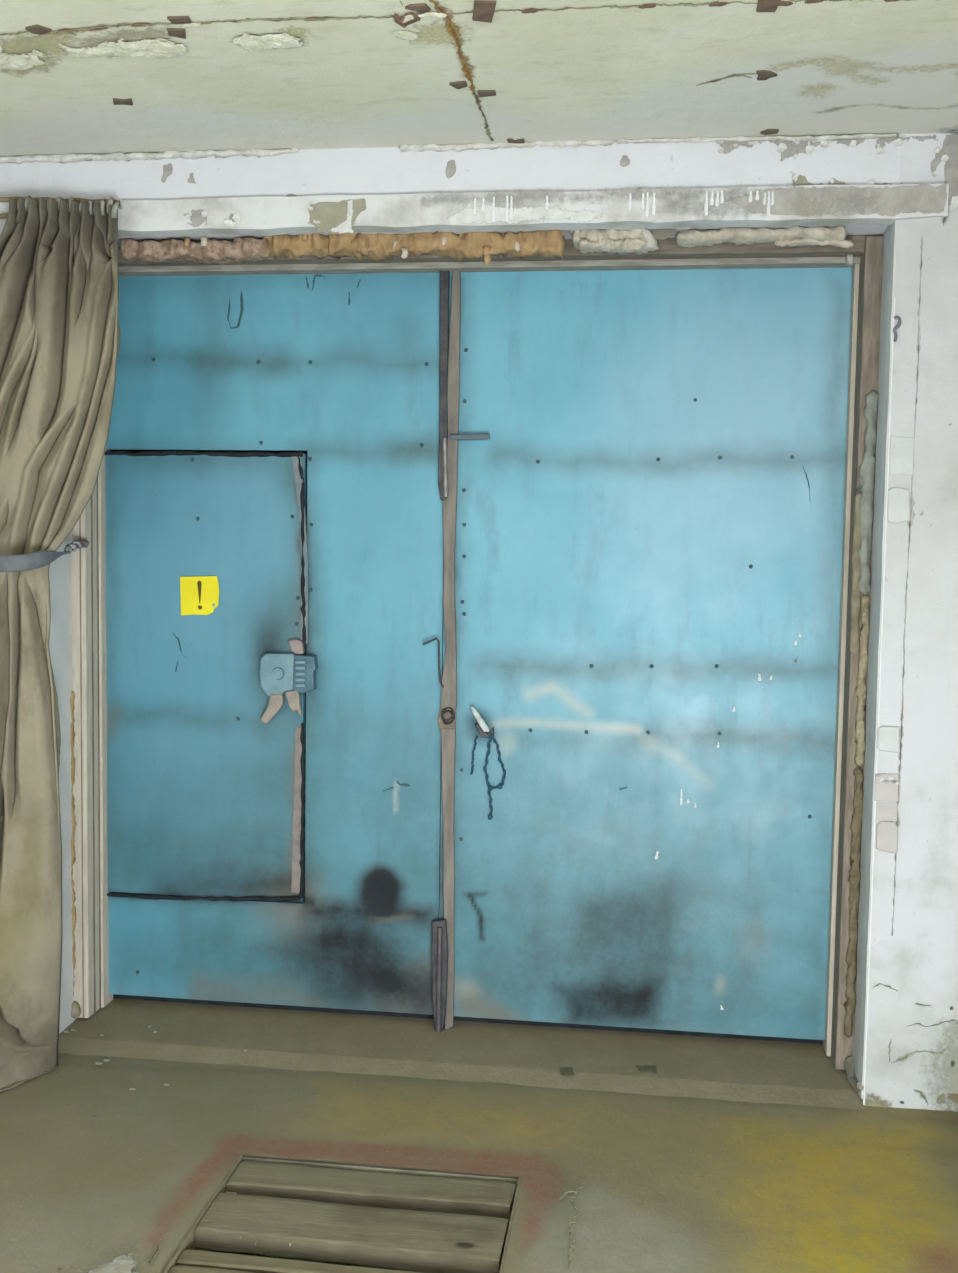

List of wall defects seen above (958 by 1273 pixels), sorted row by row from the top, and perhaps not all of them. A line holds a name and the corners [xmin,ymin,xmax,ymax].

crack [448,0,852,15]
rust [410,0,494,141]
peeling [184,209,208,227]
peeling [306,199,366,234]
leakage [935,1029,958,1112]
leakage [865,1094,891,1107]
spalling [243,1155,519,1184]
spalling [195,1247,428,1273]